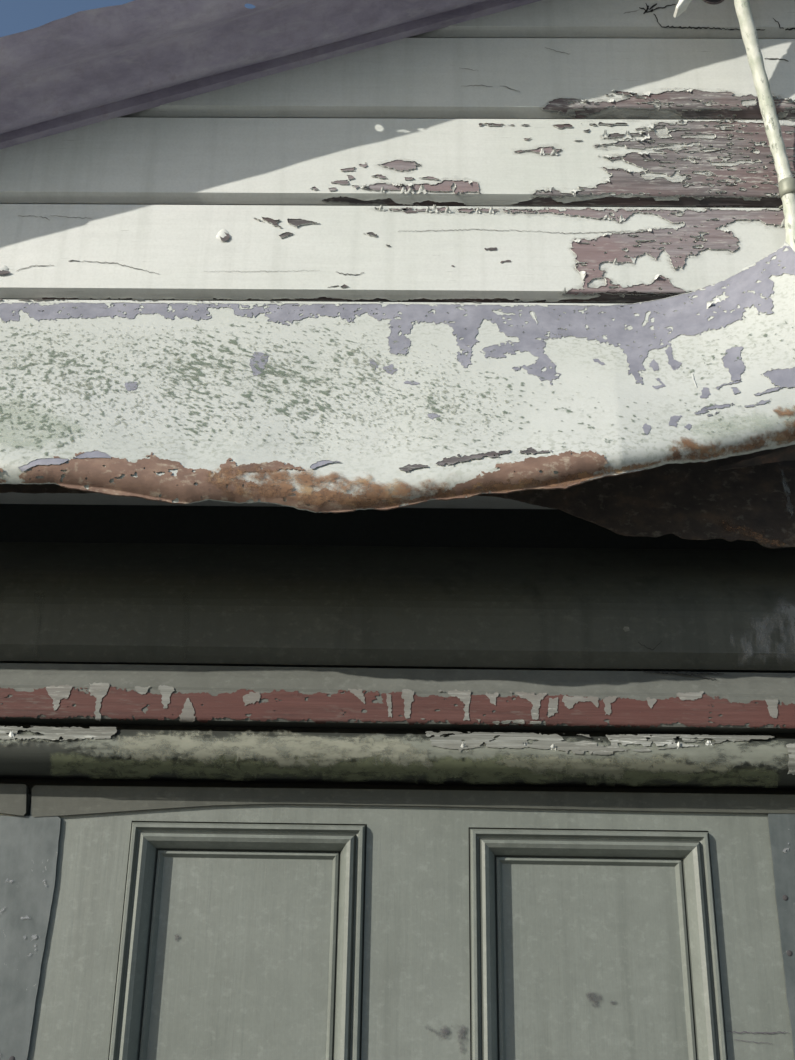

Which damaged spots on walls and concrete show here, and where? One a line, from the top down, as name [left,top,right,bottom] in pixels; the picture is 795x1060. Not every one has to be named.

crack [623,3,795,31]
peeling [0,88,795,389]
peeling [669,346,795,430]
peeling [18,450,111,472]
peeling [310,460,340,469]
corrosion [0,408,795,548]
peeling [399,447,552,472]
peeling [0,687,795,780]